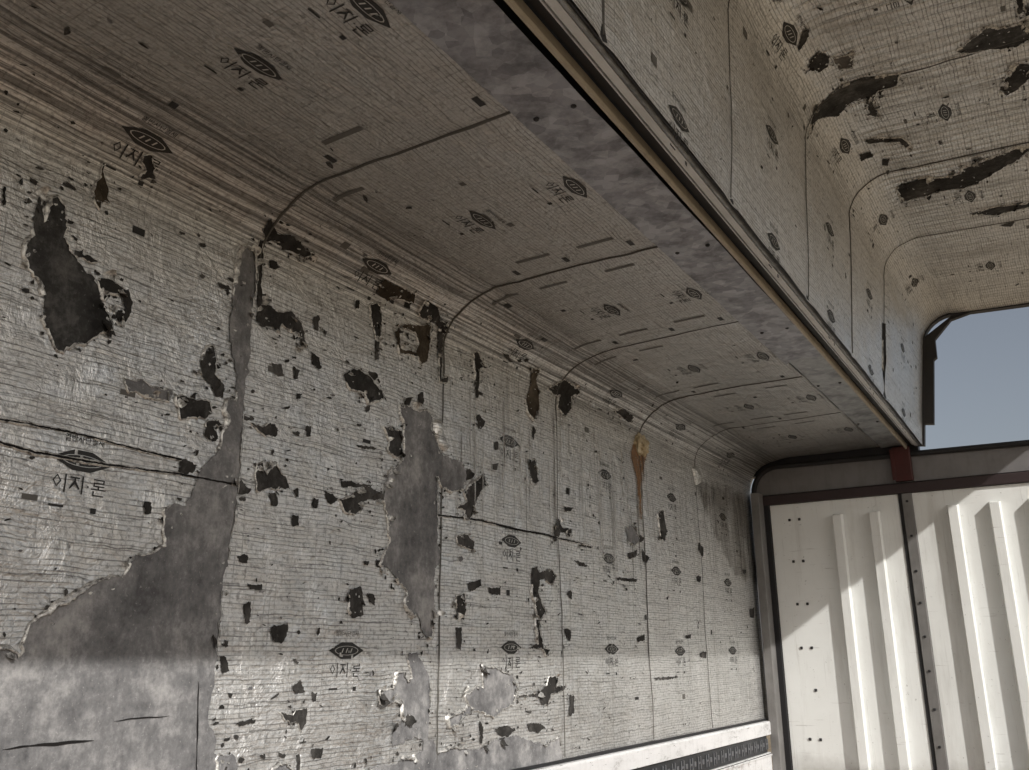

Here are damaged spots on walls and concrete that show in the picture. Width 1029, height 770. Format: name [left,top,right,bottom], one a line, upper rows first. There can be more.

peeling [798,30,911,139]
peeling [955,0,1029,97]
peeling [84,163,122,215]
peeling [859,134,919,166]
peeling [895,146,1029,207]
peeling [5,177,149,366]
peeling [336,274,453,412]
peeling [468,350,487,398]
peeling [0,213,328,770]
corrosion [631,432,649,524]
peeling [312,389,580,770]